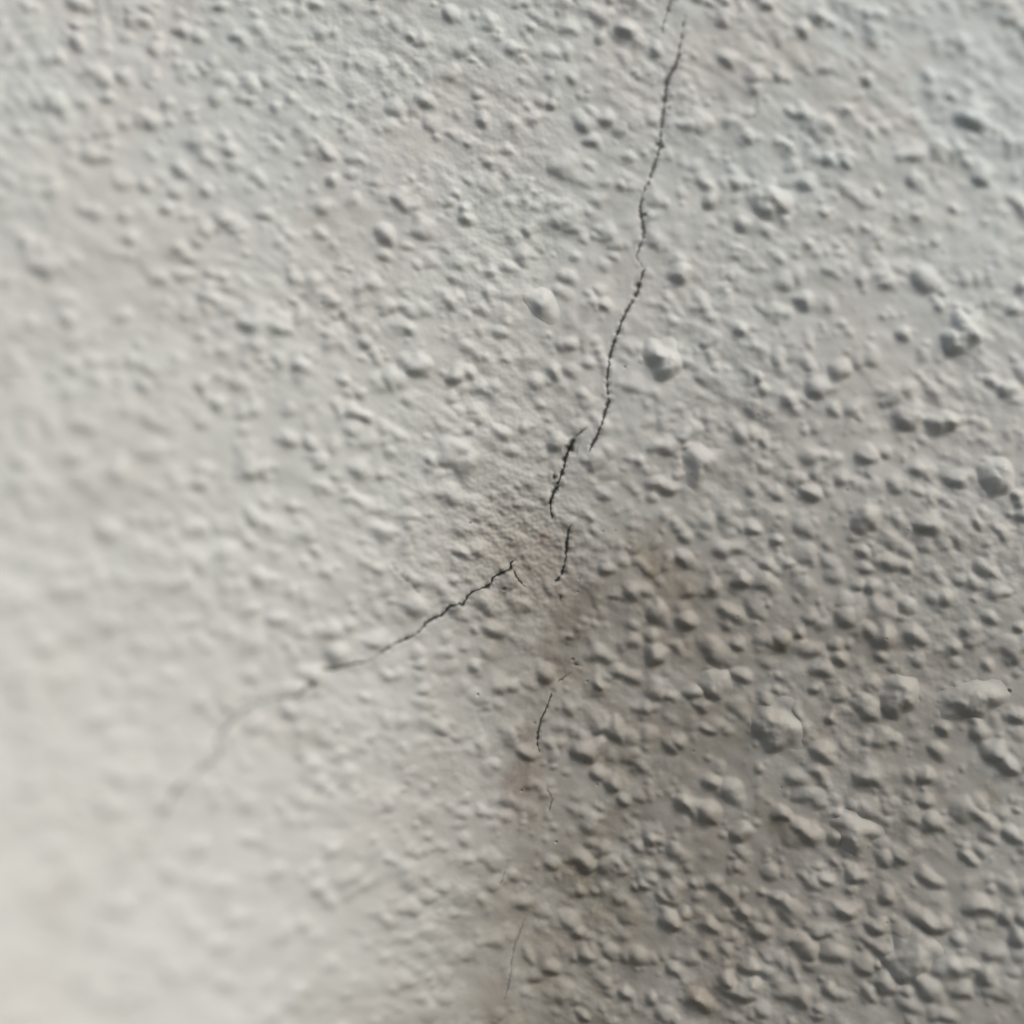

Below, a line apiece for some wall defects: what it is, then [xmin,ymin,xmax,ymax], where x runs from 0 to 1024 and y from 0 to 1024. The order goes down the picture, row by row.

crack [549,21,685,598]
crack [162,560,525,813]
crack [537,663,579,751]